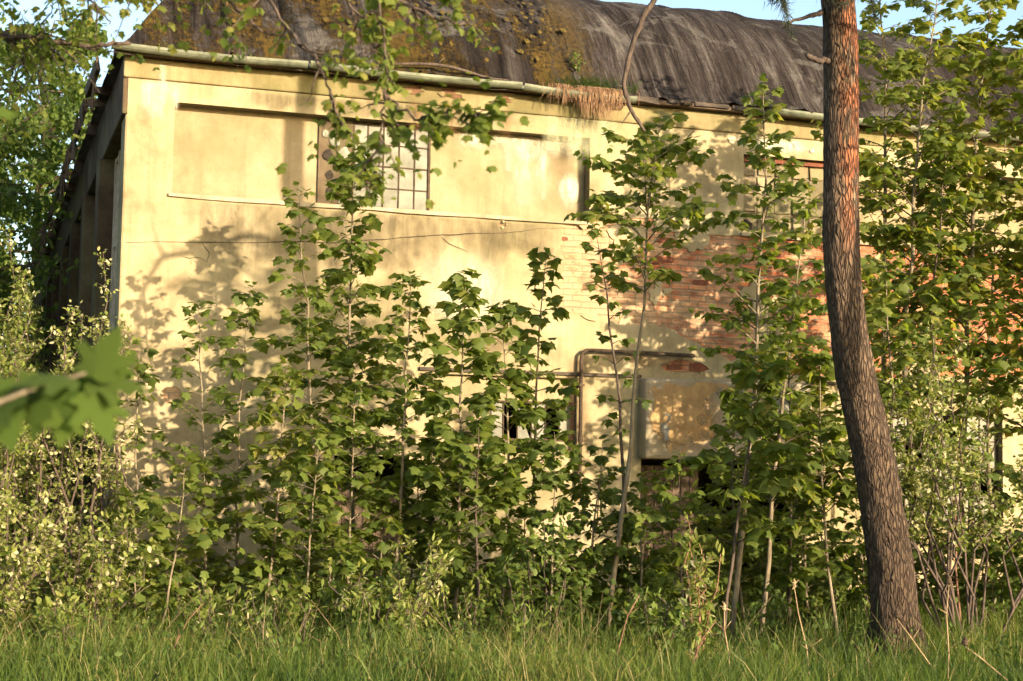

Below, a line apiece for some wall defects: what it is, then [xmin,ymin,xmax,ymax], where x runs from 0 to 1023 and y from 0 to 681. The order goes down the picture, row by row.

water stain [142,65,178,113]
flaking render [559,209,832,376]
flaking render [860,245,1023,383]
peeling [648,358,753,455]